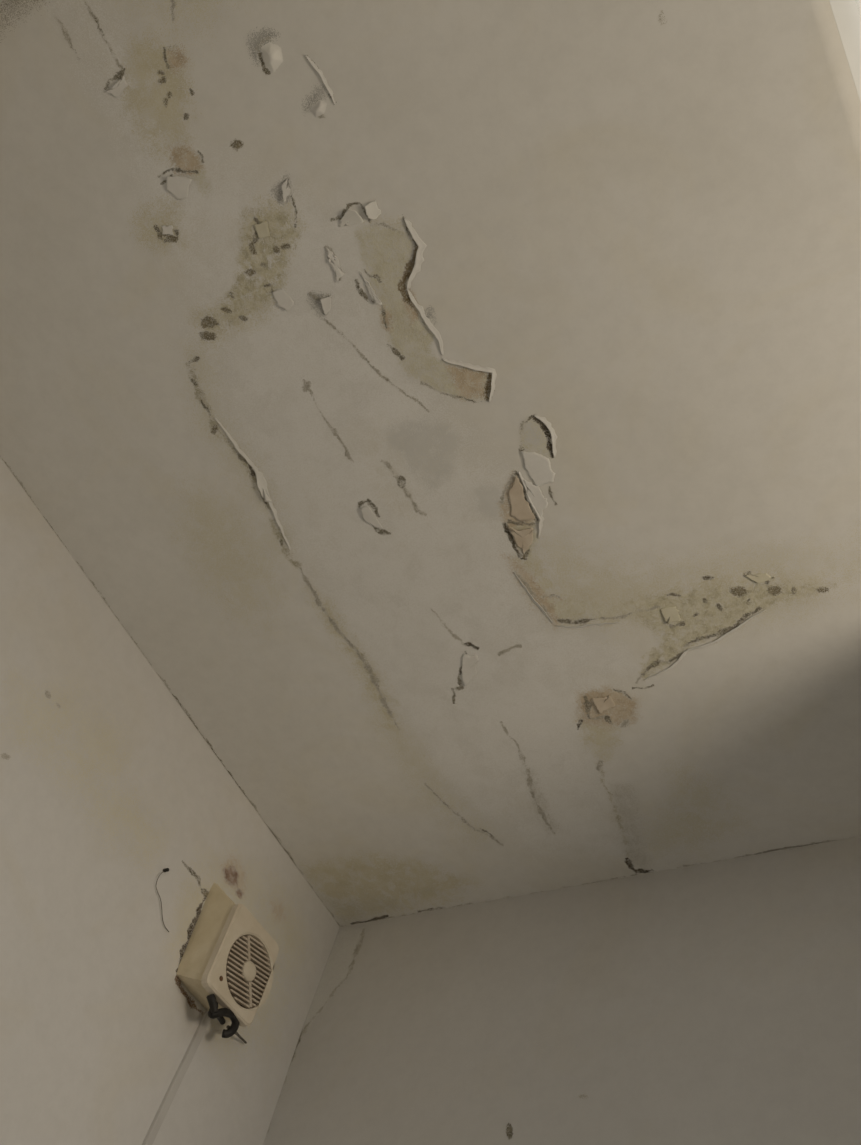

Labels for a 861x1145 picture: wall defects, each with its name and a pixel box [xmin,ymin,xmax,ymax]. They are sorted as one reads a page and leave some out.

crack [326,319,429,412]
peeling [330,200,497,403]
crack [185,356,399,730]
peeling [473,414,558,562]
crack [2,459,859,927]
peeling [574,571,839,771]